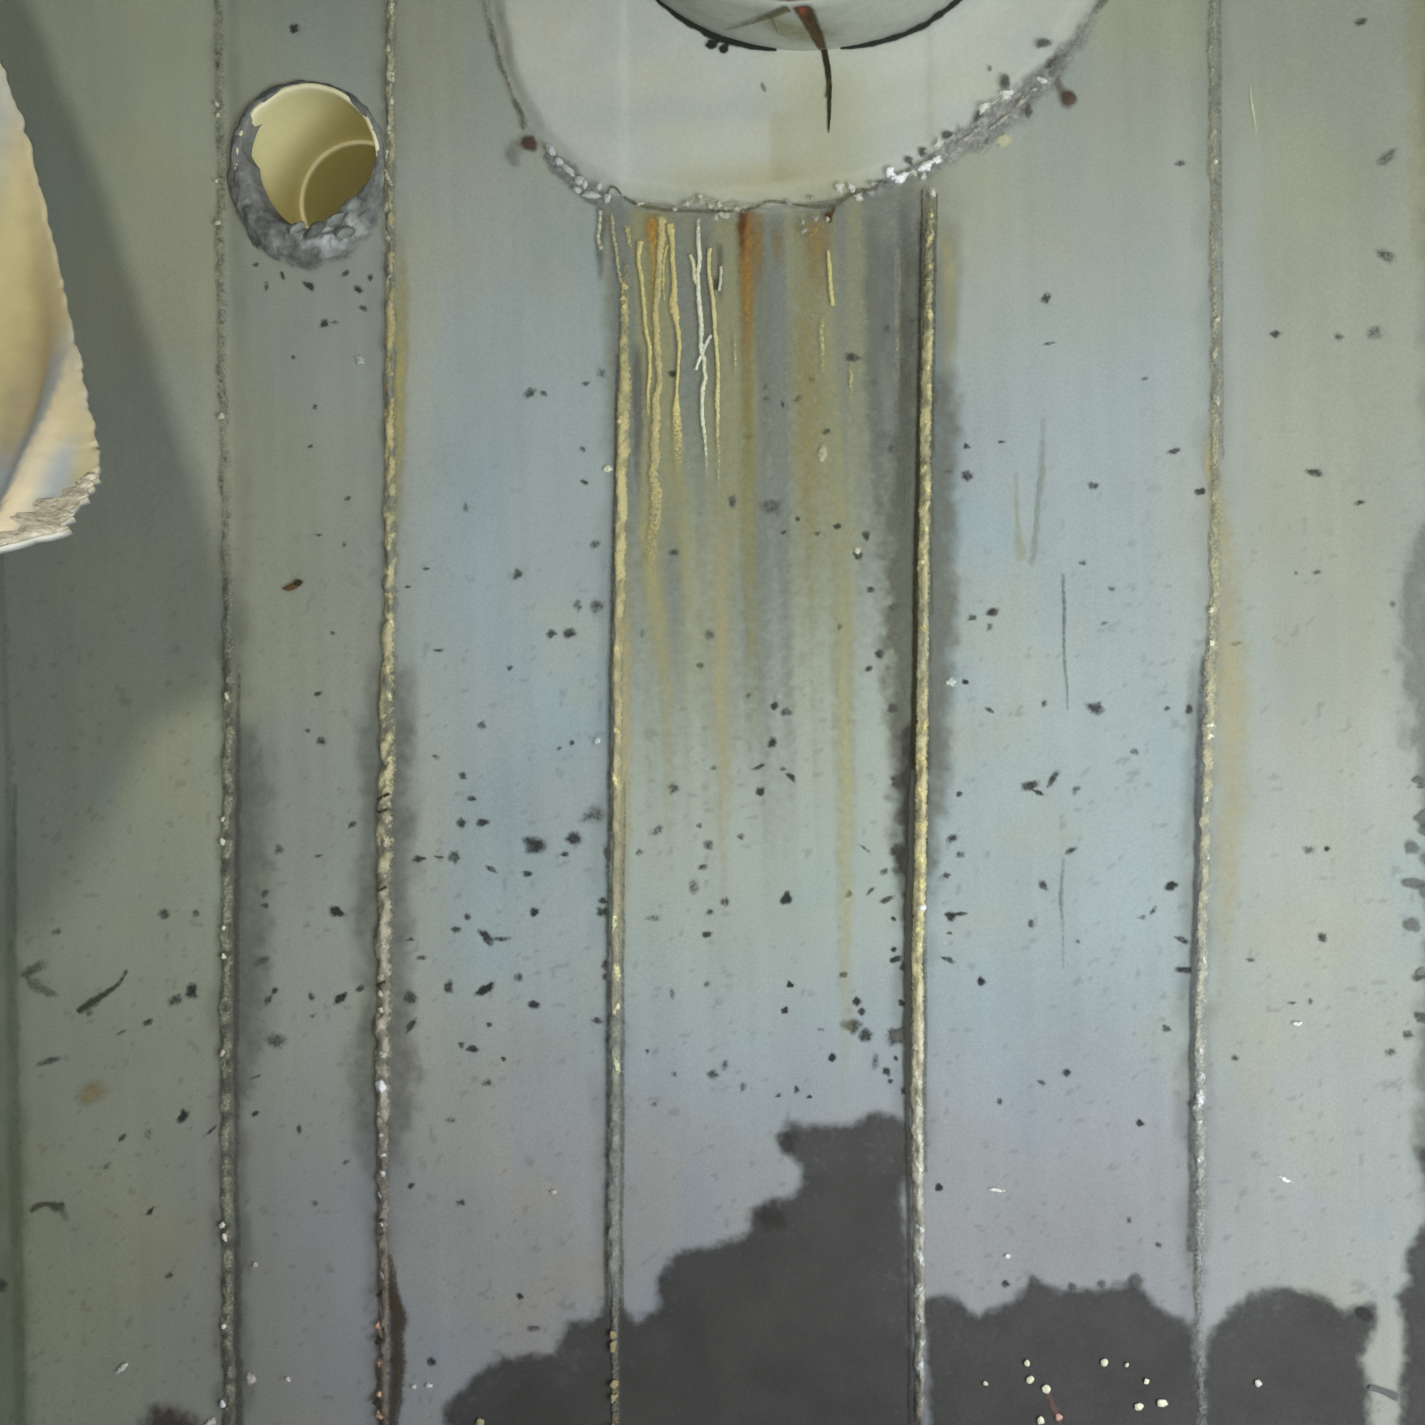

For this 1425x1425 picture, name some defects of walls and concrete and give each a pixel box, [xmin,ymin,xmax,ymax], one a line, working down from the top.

crack [656,0,777,54]
crack [821,0,962,132]
crack [605,185,866,218]
corrosion [647,217,657,311]
corrosion [739,212,778,356]
damp [544,25,1090,1003]
damp [1405,537,1425,783]
damp [1406,810,1425,862]
damp [1405,918,1420,931]
damp [1403,879,1425,897]
damp [445,1114,1425,1425]